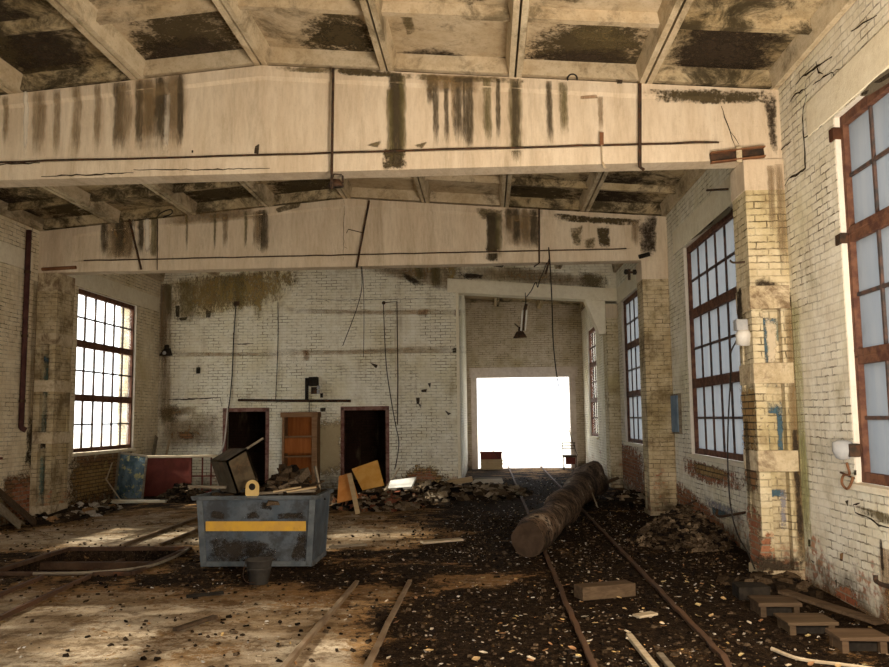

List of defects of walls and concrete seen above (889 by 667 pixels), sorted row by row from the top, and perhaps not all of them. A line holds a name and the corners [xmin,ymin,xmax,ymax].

water stain [129,11,243,60]
water stain [301,14,375,52]
water stain [505,24,647,65]
water stain [113,75,183,144]
water stain [287,67,523,168]
water stain [546,82,567,136]
water stain [650,89,777,148]
crack [781,56,839,185]
water stain [383,208,607,288]
water stain [555,214,657,252]
peeling [740,387,758,451]
peeling [676,458,814,572]